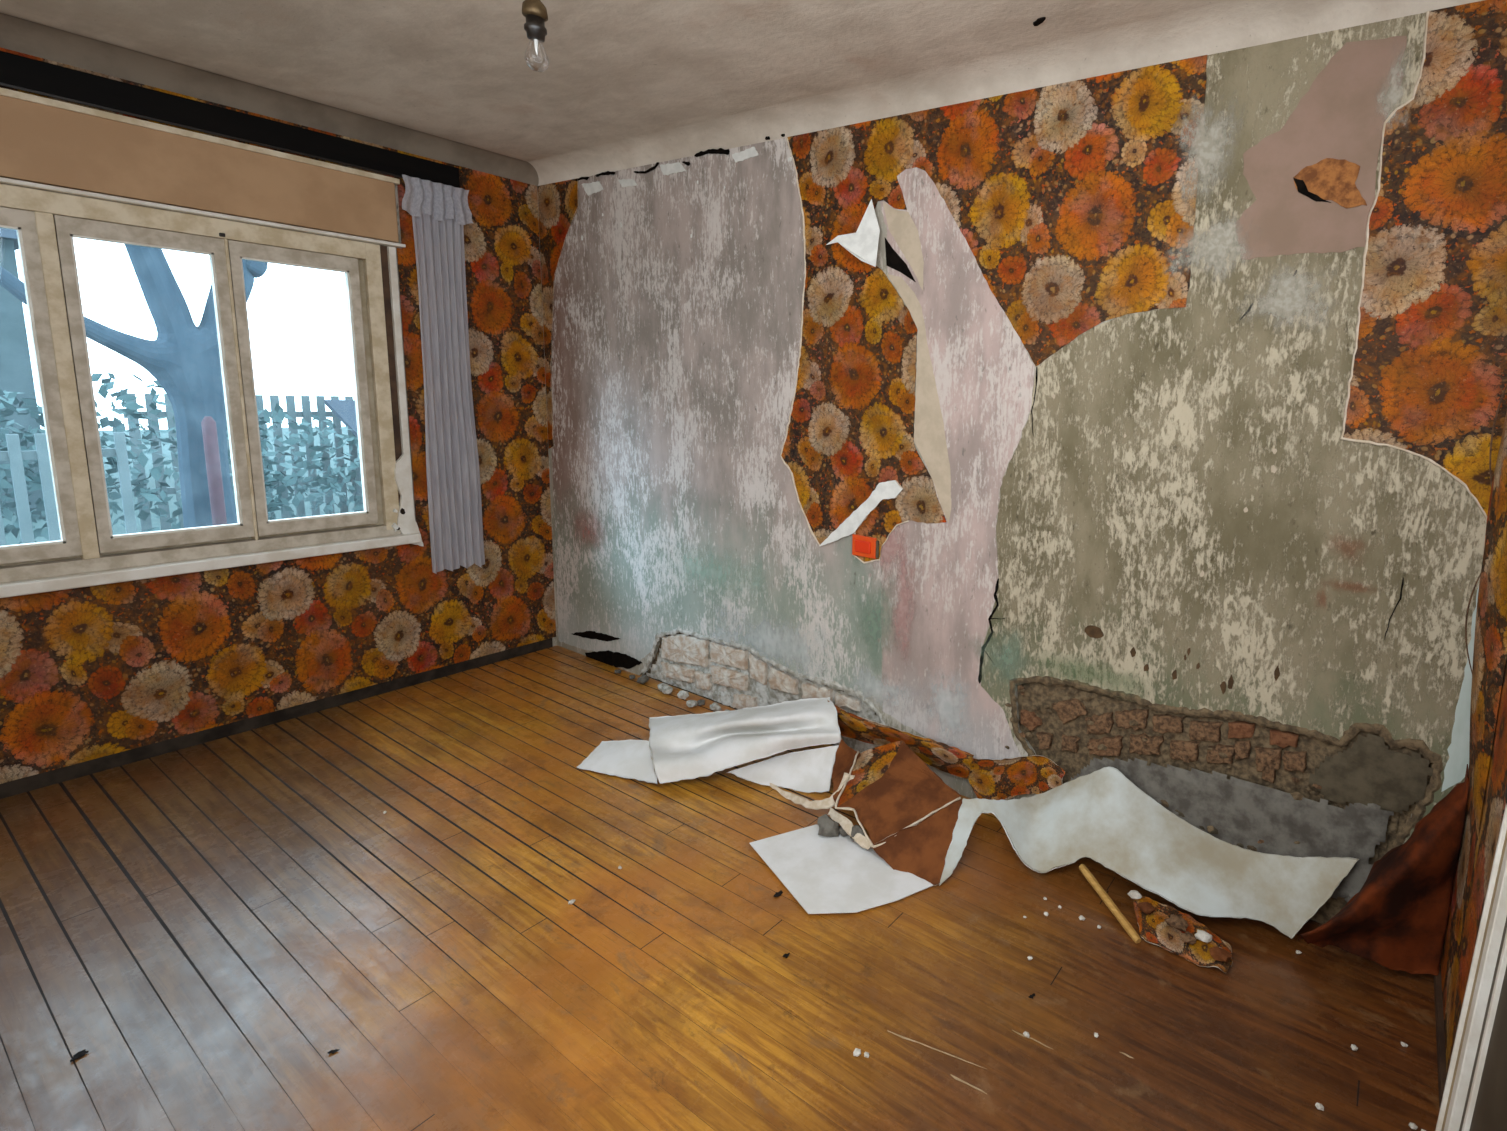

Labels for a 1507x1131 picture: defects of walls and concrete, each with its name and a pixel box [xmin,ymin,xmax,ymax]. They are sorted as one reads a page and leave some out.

peeling [552,12,1487,976]